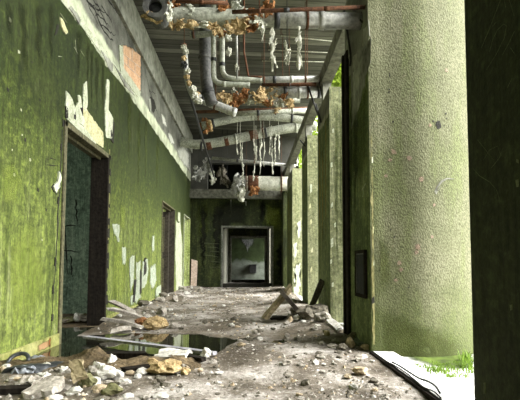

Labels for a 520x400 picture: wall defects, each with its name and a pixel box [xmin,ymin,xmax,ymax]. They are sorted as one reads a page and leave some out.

spalling [61,0,141,101]
crack [86,0,128,41]
peeling [51,79,115,297]
peeling [108,216,161,305]
damp [199,201,246,266]
damp [276,198,289,278]
peeling [293,220,301,295]